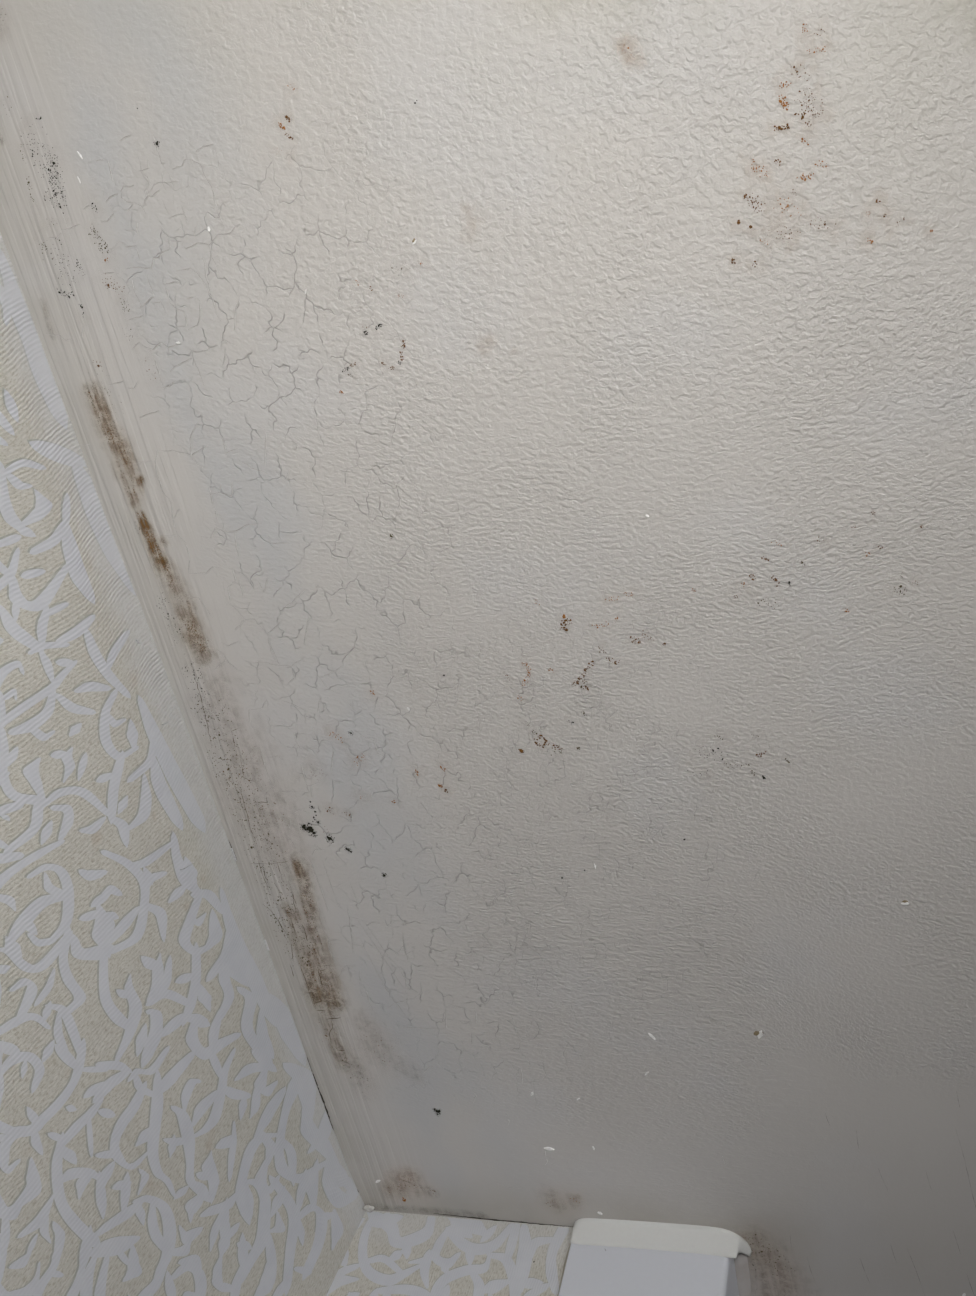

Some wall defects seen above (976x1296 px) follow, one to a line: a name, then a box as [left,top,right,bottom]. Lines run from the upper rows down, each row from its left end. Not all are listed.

crack [62,134,240,418]
water stain [85,360,368,1093]
crack [194,674,344,1051]